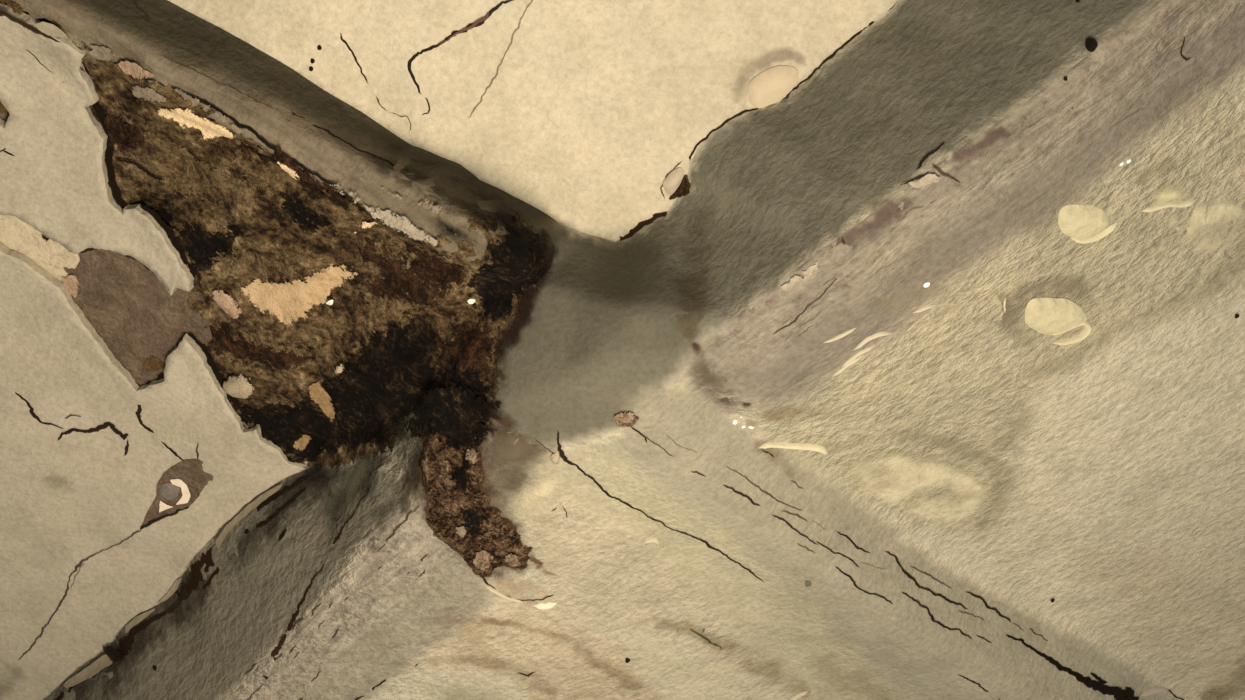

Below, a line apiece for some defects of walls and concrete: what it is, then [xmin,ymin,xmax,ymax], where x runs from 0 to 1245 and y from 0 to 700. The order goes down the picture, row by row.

peeling [0,0,66,42]
crack [160,55,408,171]
crack [340,0,533,130]
crack [15,392,199,461]
flaking render [0,41,557,700]
leakage [693,345,719,384]
crack [534,430,763,582]
leakage [864,456,983,521]
crack [647,436,1185,700]